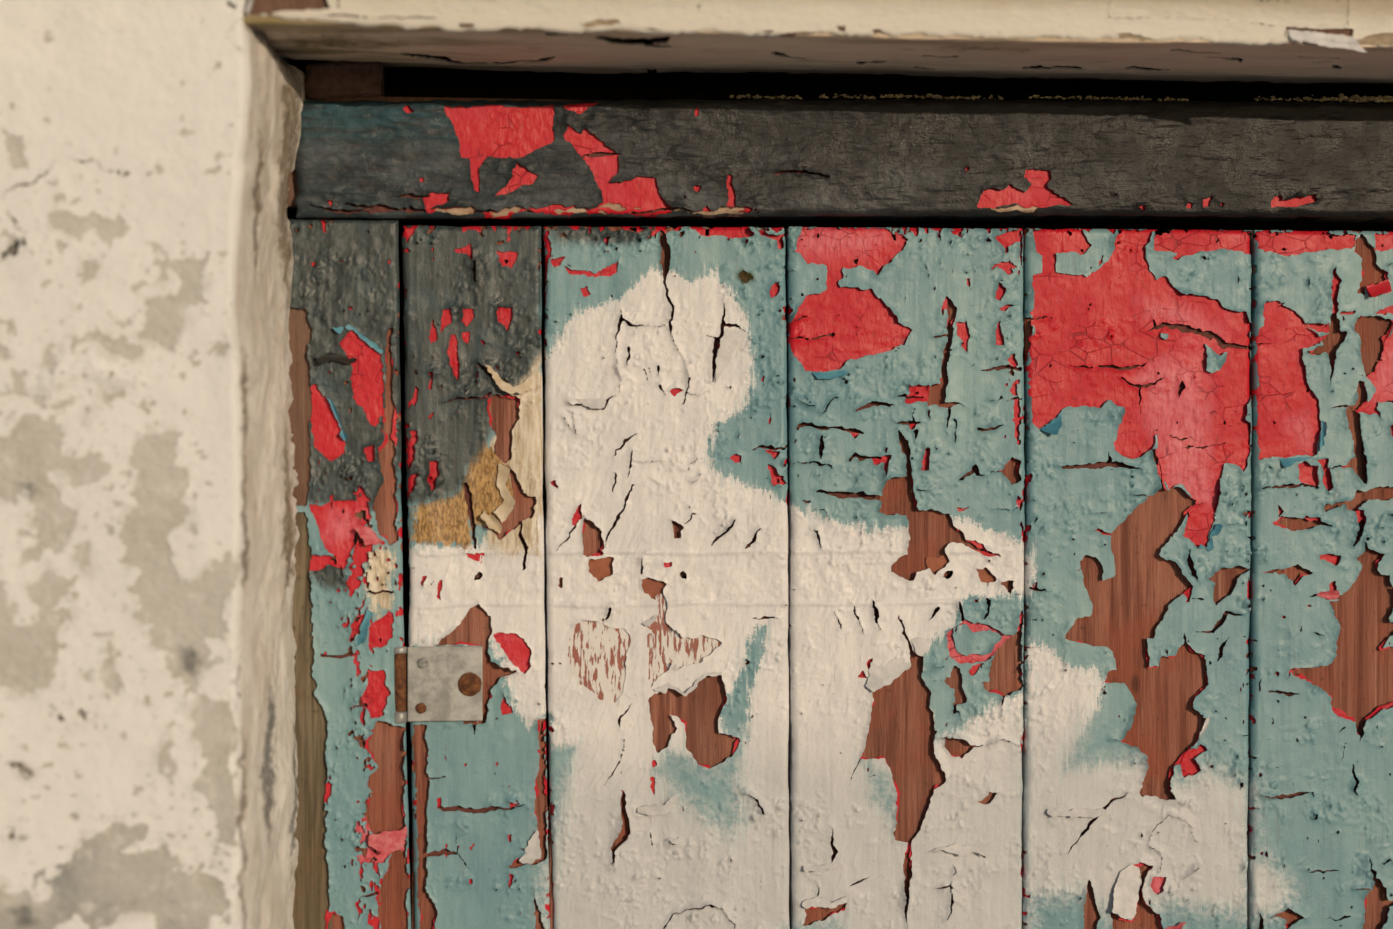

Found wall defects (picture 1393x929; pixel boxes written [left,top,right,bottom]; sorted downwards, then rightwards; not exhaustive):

crack [599,35,670,43]
peeling [388,103,970,417]
crack [518,433,761,570]
crack [564,281,747,433]
peeling [871,431,1013,593]
crack [1058,454,1146,496]
crack [1070,319,1252,414]
peeling [986,228,1393,800]
crack [1167,411,1237,449]
peeling [438,604,532,725]
peeling [648,672,746,784]
peeling [858,611,1028,922]